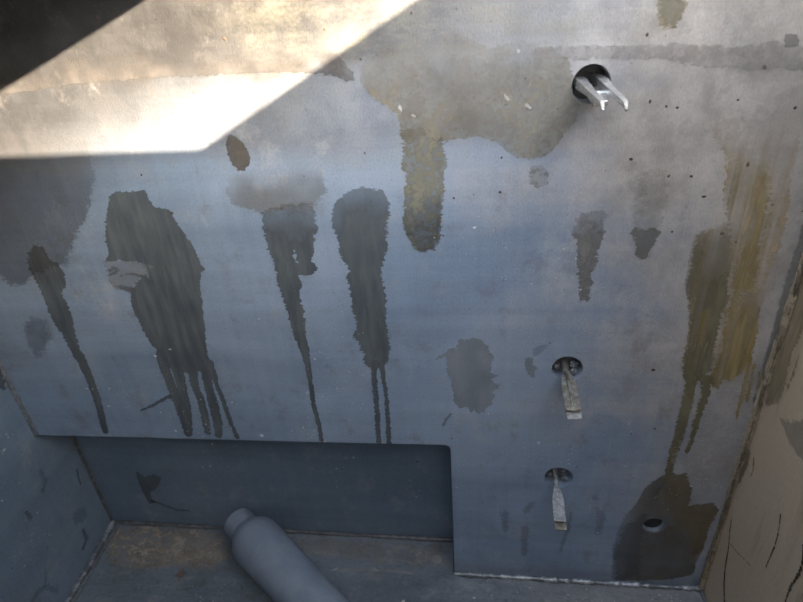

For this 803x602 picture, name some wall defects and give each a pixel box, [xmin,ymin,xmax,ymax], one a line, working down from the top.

leakage [27,245,109,434]
leakage [104,190,239,439]
leakage [262,205,324,443]
leakage [331,197,392,444]
leakage [400,128,448,253]
leakage [572,220,606,302]
leakage [630,227,661,259]
rust [664,175,791,483]
leakage [622,473,719,581]